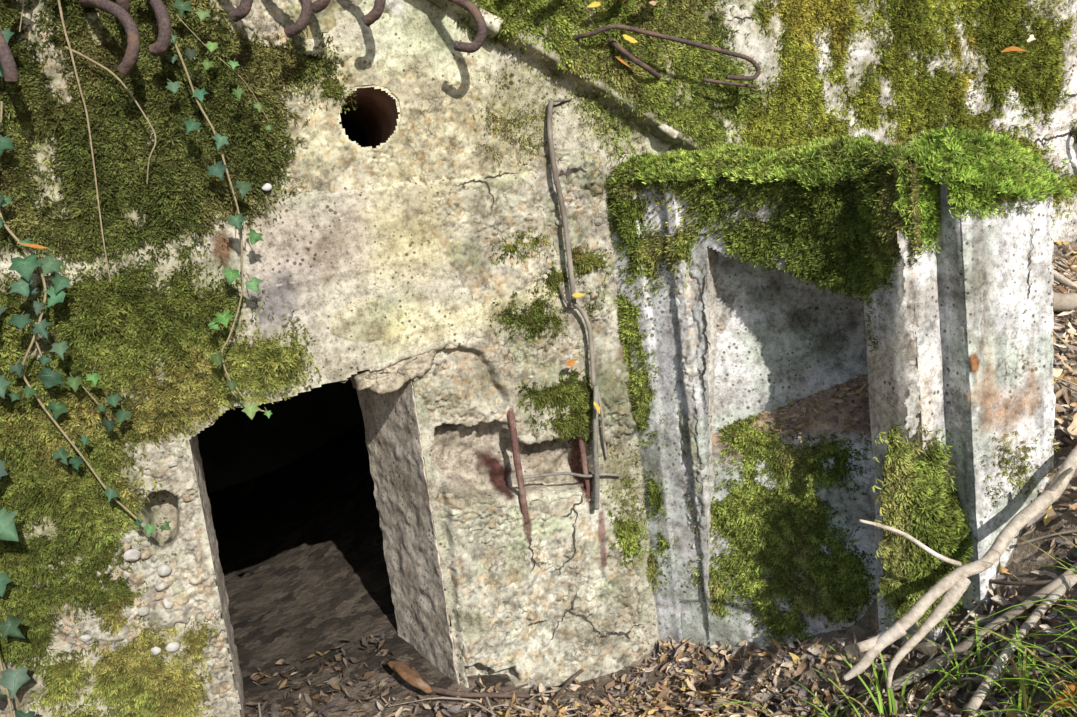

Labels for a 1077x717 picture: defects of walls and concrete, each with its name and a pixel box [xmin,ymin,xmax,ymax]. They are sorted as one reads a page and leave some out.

spalling [269,54,646,688]
crack [700,267,710,410]
rust [970,353,979,373]
rust [479,451,514,499]
rust [570,436,592,501]
rust [524,513,532,541]
crack [529,491,644,640]
rust [598,511,607,565]